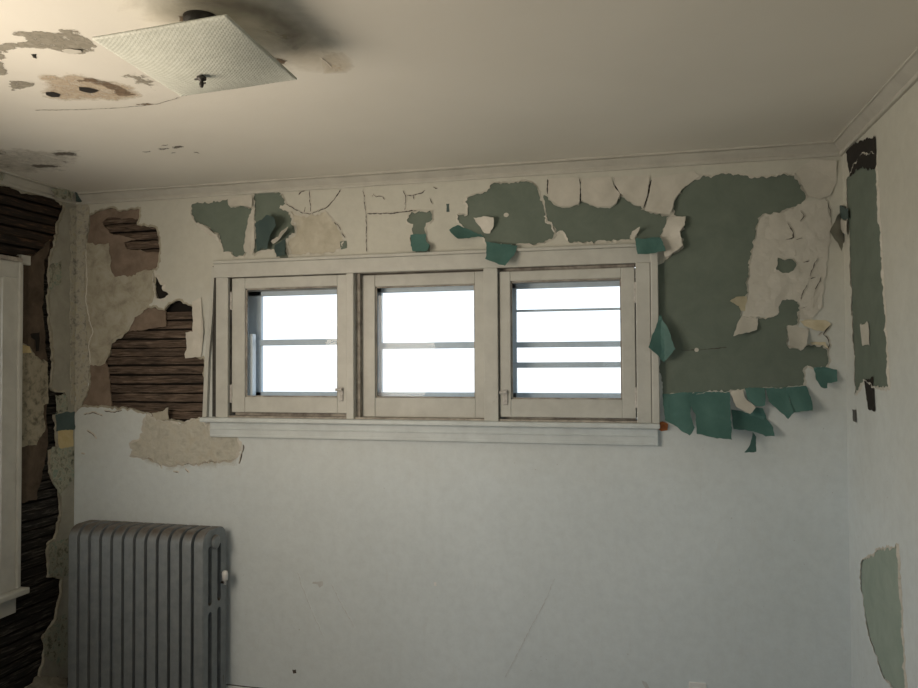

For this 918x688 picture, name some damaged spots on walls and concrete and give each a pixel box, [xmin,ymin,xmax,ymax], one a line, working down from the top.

peeling [190,192,297,258]
crack [286,186,438,252]
peeling [406,210,434,252]
peeling [446,171,837,453]
flaking render [40,188,242,676]